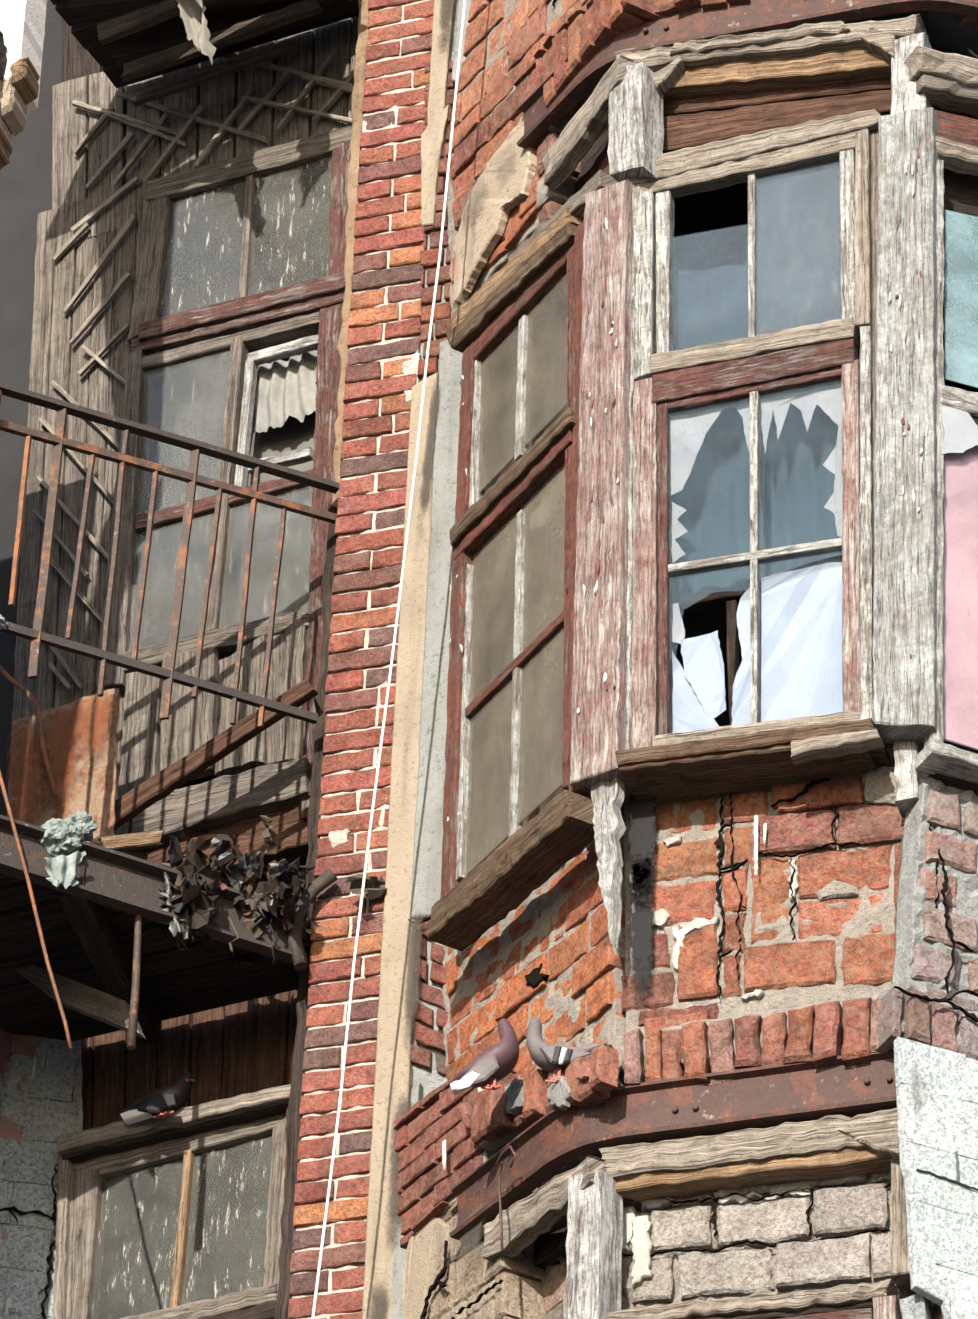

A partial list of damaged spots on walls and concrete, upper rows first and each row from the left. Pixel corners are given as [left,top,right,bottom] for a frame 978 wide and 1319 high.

peeling [565,539,600,601]
rust [8,696,112,821]
spalling [662,834,682,848]
crack [714,776,865,999]
spalling [787,860,799,902]
spalling [652,909,720,971]
crack [893,823,978,1022]
spalling [524,963,550,989]
spalling [741,989,765,1002]
spalling [489,1078,524,1119]
crack [0,1164,57,1319]
crack [420,1240,503,1319]